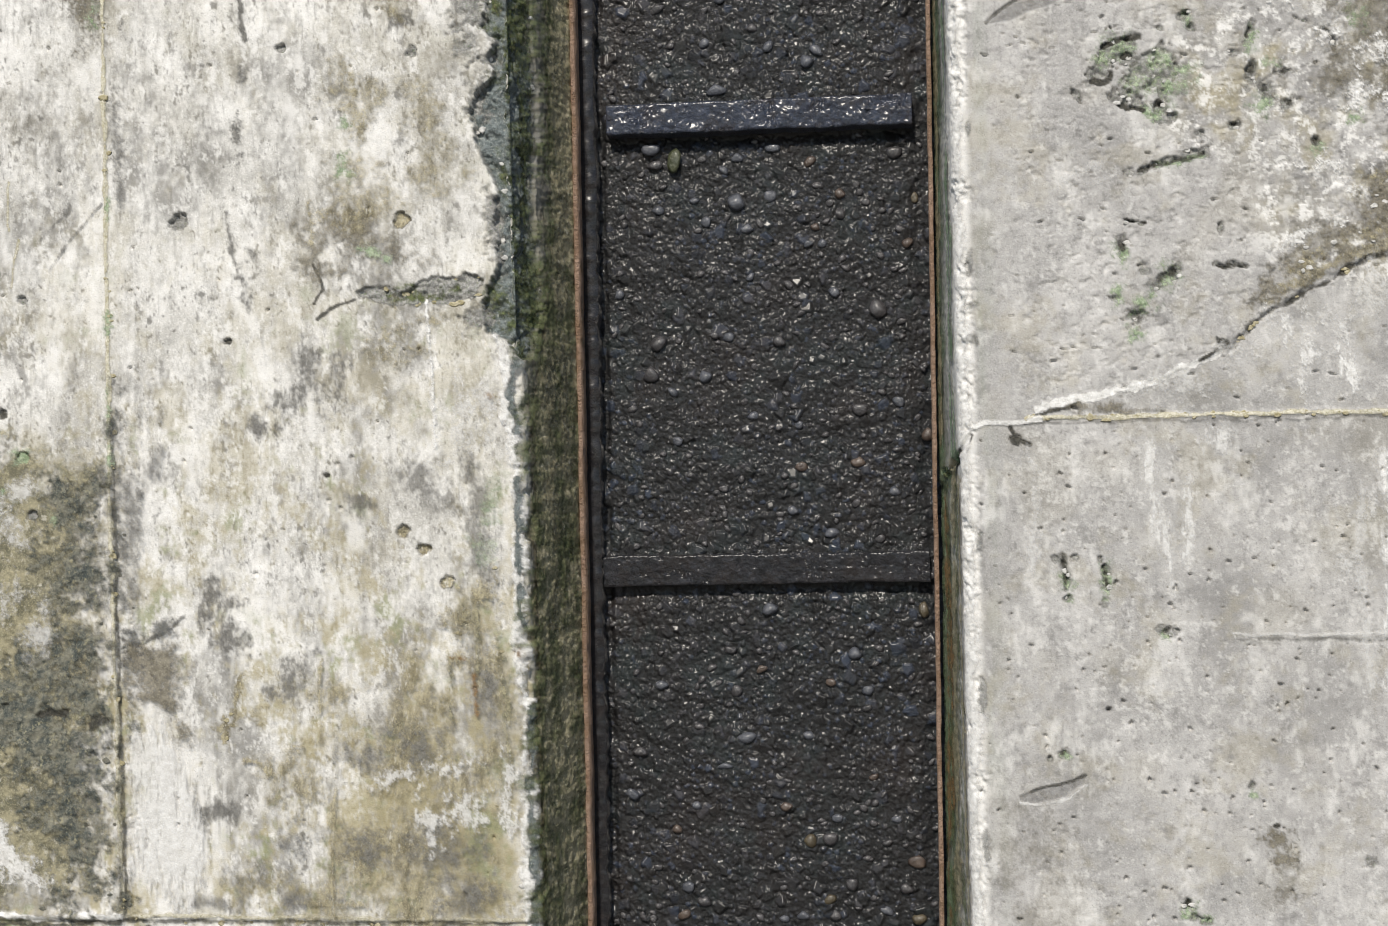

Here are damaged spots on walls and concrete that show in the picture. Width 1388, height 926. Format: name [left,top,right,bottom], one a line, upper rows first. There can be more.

damp [1314,0,1388,110]
damp [0,429,142,751]
damp [105,392,121,439]
damp [121,619,191,739]
damp [191,0,593,926]
spalling [312,0,545,926]
crack [943,238,1388,504]
damp [1250,146,1388,404]
damp [0,730,126,909]